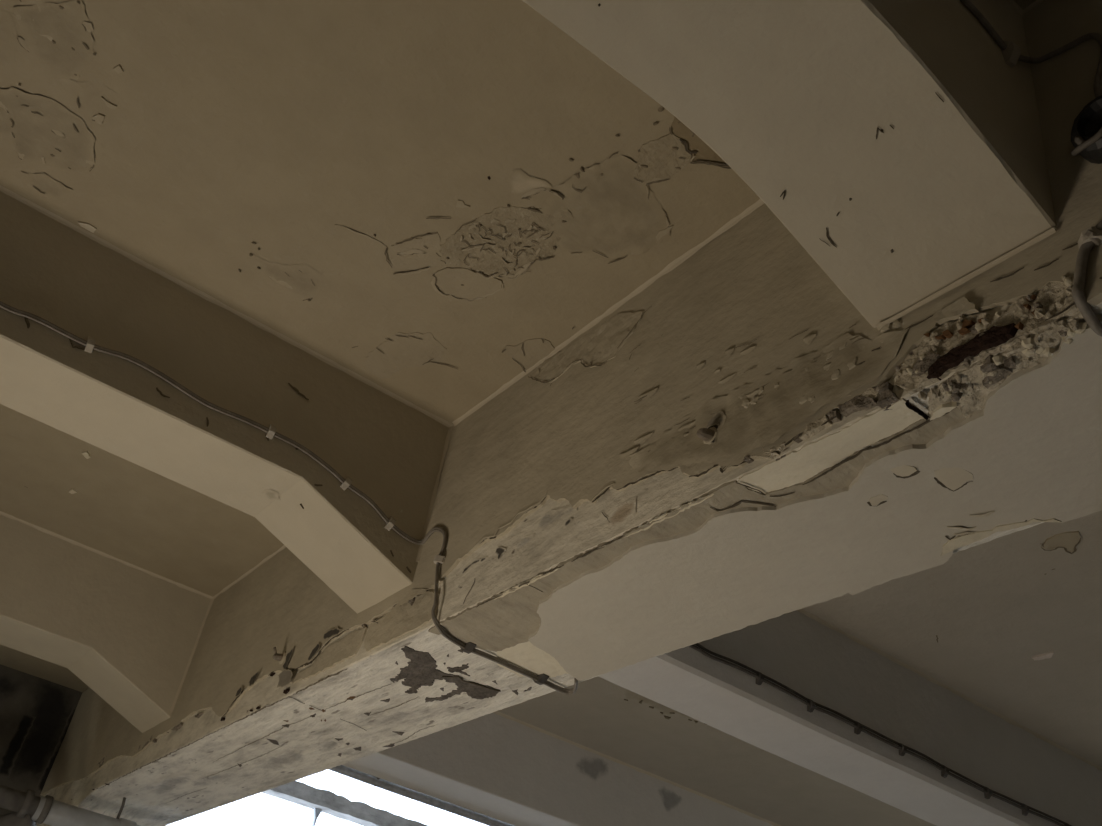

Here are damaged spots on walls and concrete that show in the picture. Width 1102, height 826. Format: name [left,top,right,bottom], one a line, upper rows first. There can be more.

peeling [634,106,731,195]
flaking render [390,275,1087,702]
peeling [624,688,707,725]